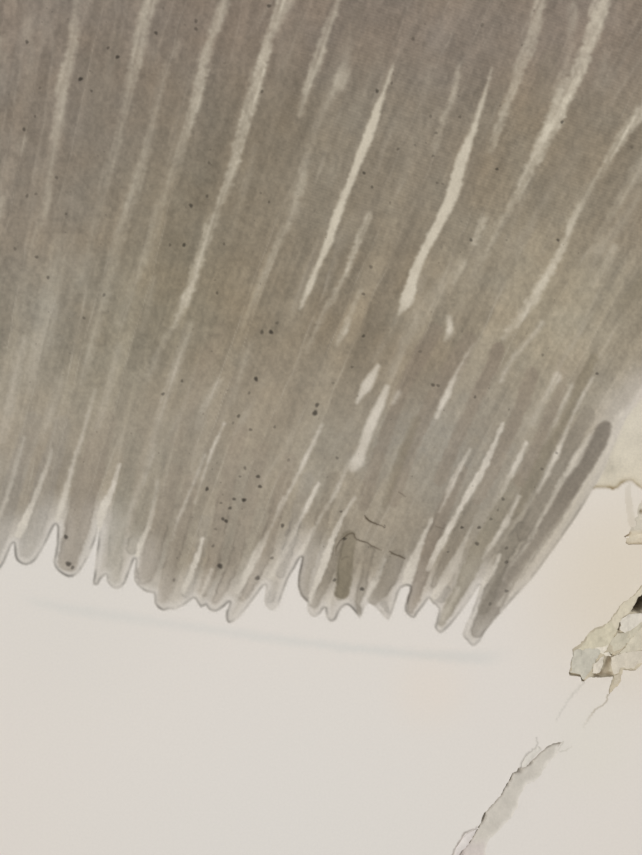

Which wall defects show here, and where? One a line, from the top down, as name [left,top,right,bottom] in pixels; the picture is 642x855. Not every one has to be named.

leakage [0,0,642,667]
flaking render [569,585,642,693]
crack [451,694,610,855]